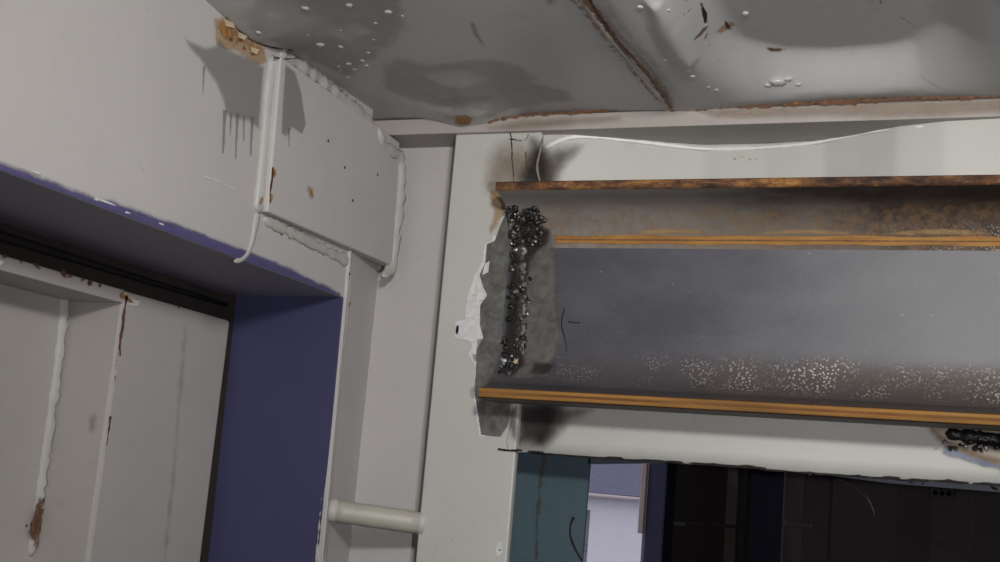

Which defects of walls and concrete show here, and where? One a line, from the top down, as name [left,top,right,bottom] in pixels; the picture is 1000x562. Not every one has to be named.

corrosion [572,0,707,111]
corrosion [736,96,1000,108]
corrosion [555,230,1000,246]
corrosion [115,292,140,379]
corrosion [26,499,45,545]